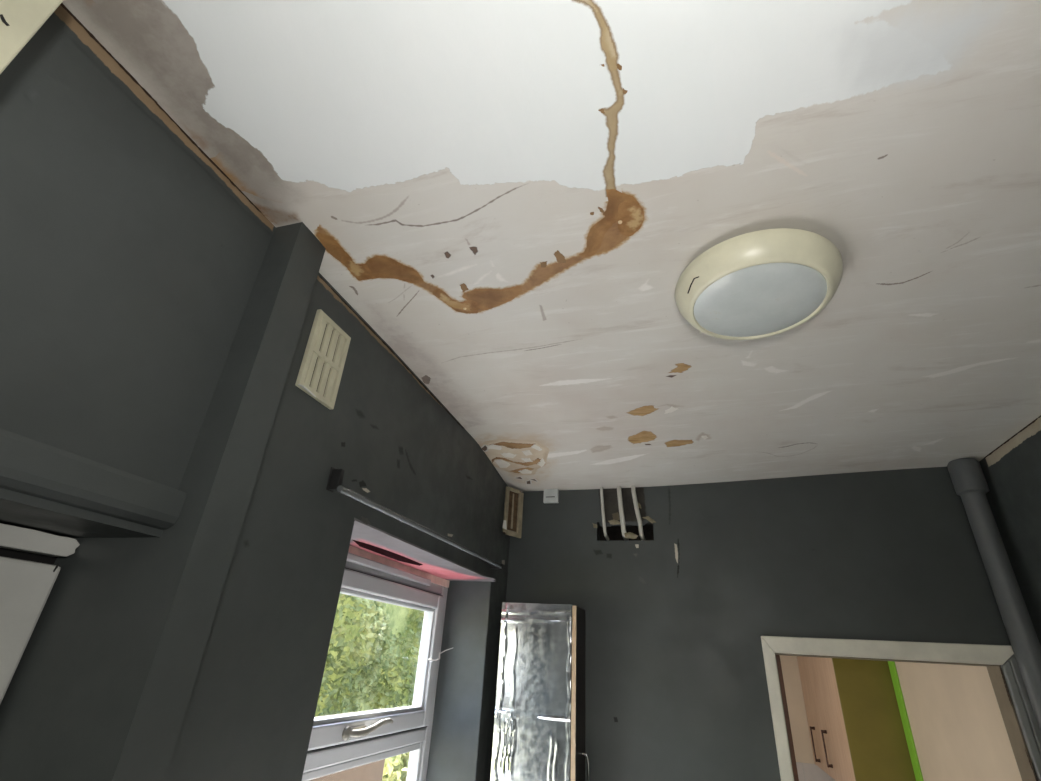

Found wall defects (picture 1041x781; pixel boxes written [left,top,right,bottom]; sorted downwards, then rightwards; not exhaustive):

water stain [62,0,652,428]
spalling [441,250,454,261]
spalling [462,236,481,257]
peeling [660,360,697,380]
flaking render [465,402,715,491]
peeling [984,415,1041,471]
spalling [592,487,656,561]